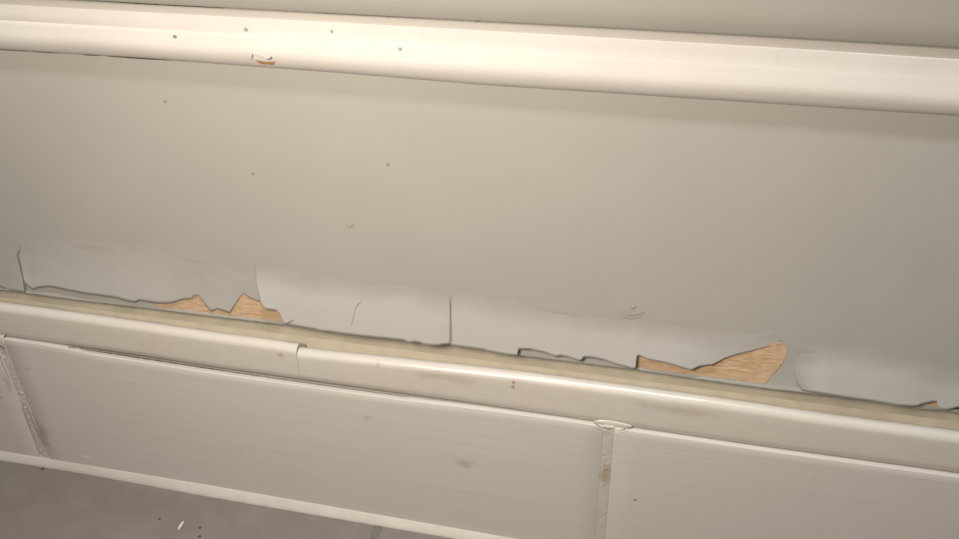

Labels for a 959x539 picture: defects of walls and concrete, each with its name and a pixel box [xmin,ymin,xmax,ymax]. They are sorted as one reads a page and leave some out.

peeling [0,237,959,410]